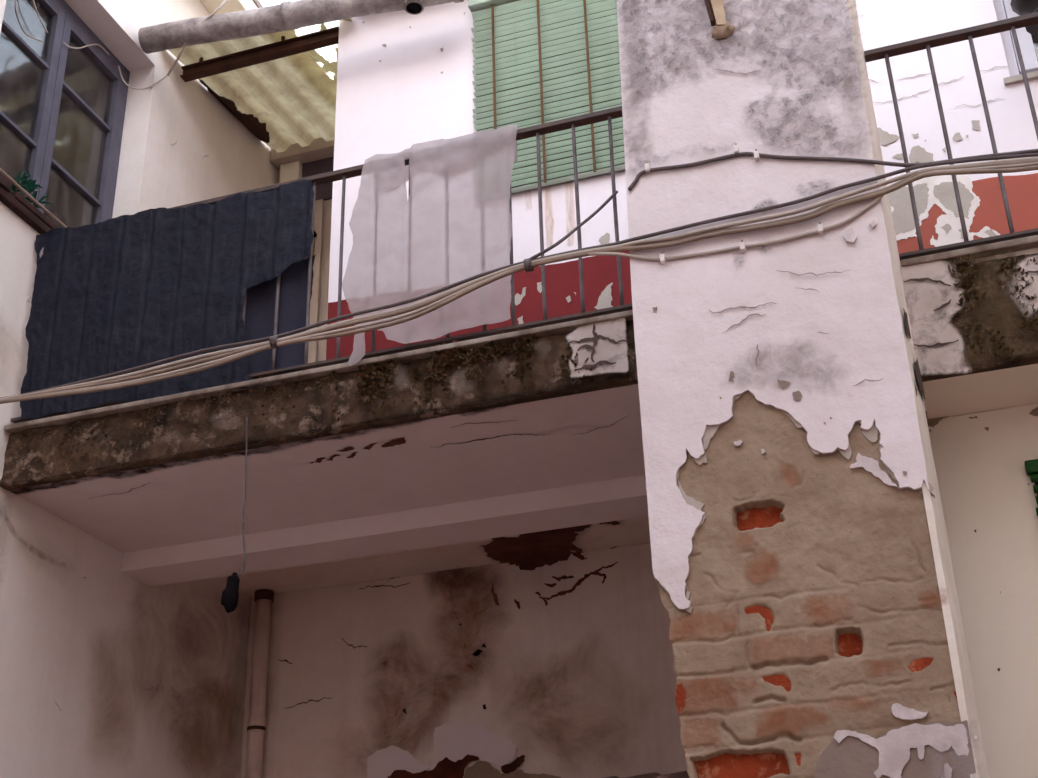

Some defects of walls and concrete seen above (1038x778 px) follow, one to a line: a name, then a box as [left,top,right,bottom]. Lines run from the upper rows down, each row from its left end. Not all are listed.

water stain [624,0,852,151]
peeling [877,120,980,163]
peeling [887,175,1000,247]
peeling [515,282,542,324]
peeling [595,282,613,310]
peeling [777,379,802,401]
spalling [913,359,949,432]
water stain [8,375,629,494]
peeling [309,437,406,464]
crack [491,561,618,609]
flaking render [656,392,978,778]
flaking render [388,754,561,778]